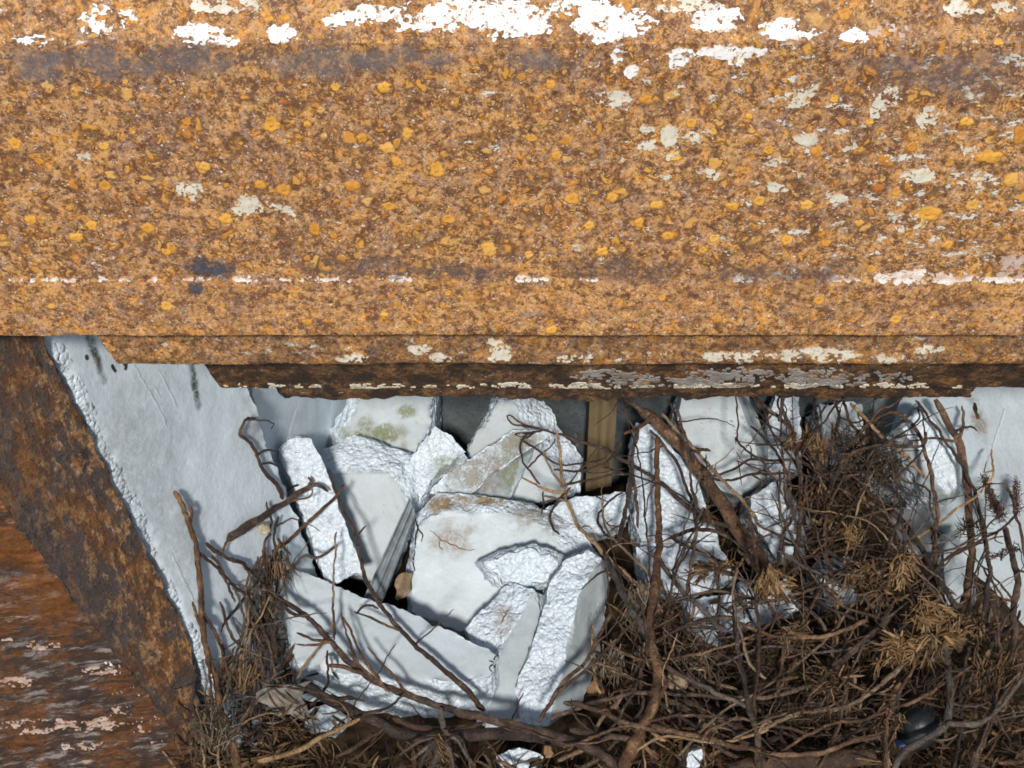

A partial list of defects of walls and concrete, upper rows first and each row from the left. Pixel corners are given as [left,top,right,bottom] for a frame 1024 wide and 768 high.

peeling [171,0,263,48]
peeling [266,23,298,44]
peeling [322,0,820,79]
corrosion [356,126,414,168]
corrosion [974,149,1004,164]
corrosion [799,199,815,211]
corrosion [912,205,944,221]
corrosion [68,220,98,243]
corrosion [480,241,498,257]
peeling [826,254,1024,286]
peeling [549,344,945,389]
peeling [0,685,163,751]